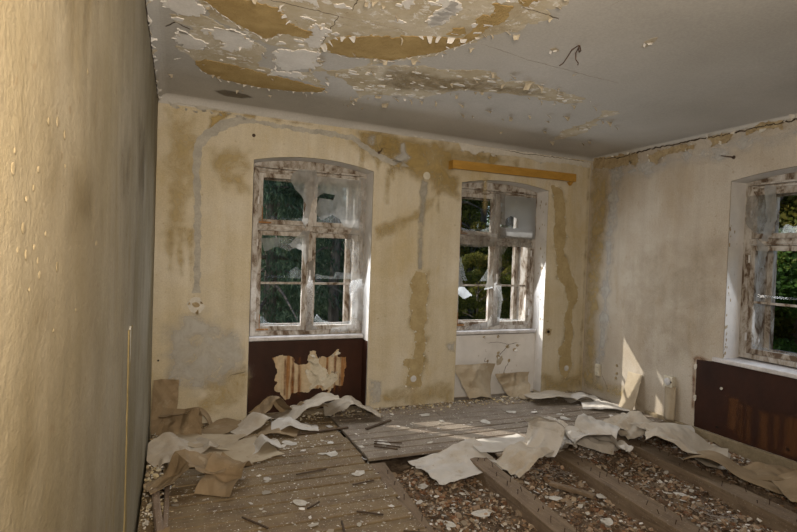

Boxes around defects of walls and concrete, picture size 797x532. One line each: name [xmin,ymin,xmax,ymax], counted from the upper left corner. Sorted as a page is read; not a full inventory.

crack [271,0,402,42]
peeling [160,0,620,146]
peeling [453,141,694,171]
spalling [706,114,795,147]
peeling [539,185,578,379]
peeling [403,271,429,389]
peeling [272,349,346,400]